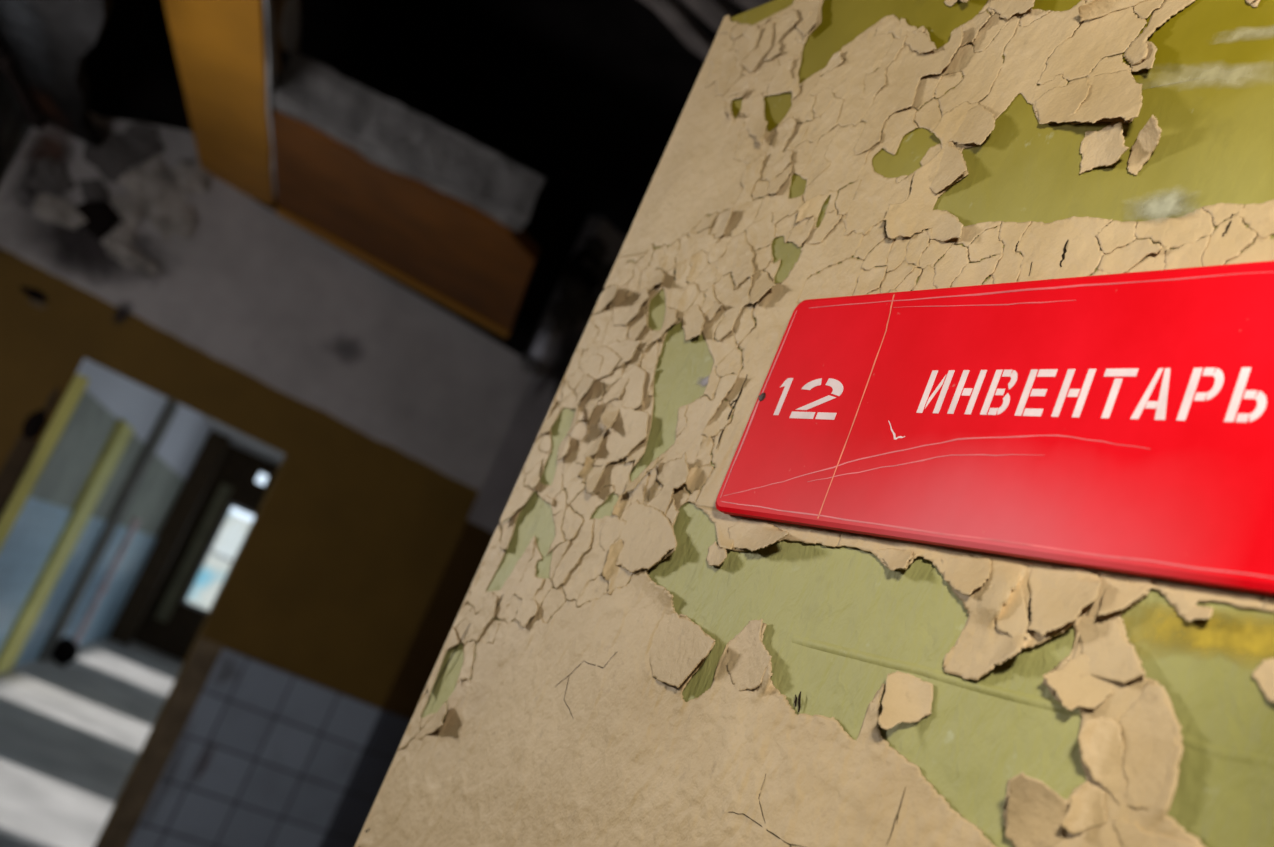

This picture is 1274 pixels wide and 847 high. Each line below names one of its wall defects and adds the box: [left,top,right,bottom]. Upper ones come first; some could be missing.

spalling [26,121,212,277]
crack [717,374,748,447]
peeling [397,0,1274,751]
peeling [837,532,1274,847]